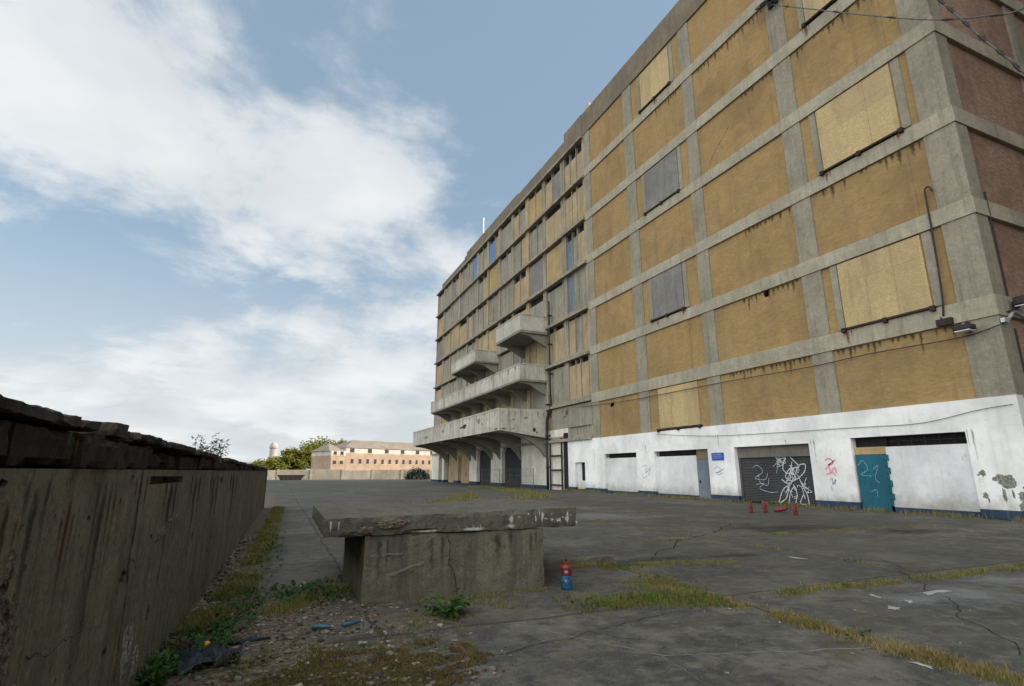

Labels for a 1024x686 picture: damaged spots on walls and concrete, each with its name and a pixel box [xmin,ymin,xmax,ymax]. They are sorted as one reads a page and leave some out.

peeling [977,470,1024,511]
crack [877,557,1021,656]